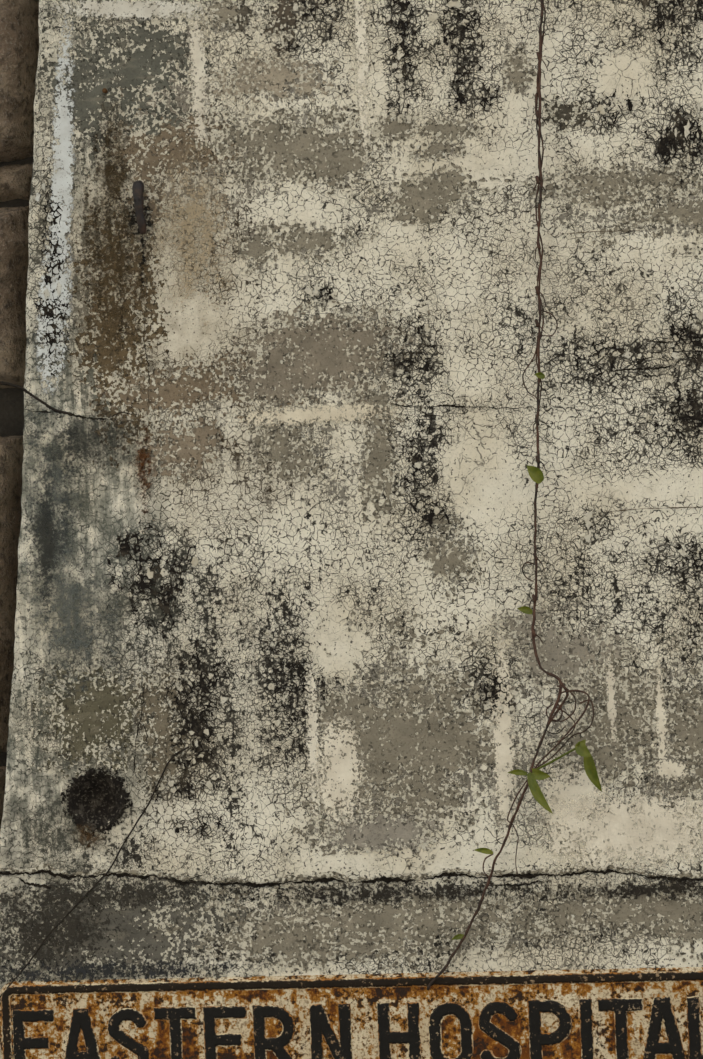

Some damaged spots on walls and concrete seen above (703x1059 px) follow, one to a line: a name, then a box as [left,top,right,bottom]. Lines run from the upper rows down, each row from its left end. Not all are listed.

peeling [33,0,703,617]
peeling [29,521,238,836]
peeling [0,592,703,984]
crack [0,863,703,909]